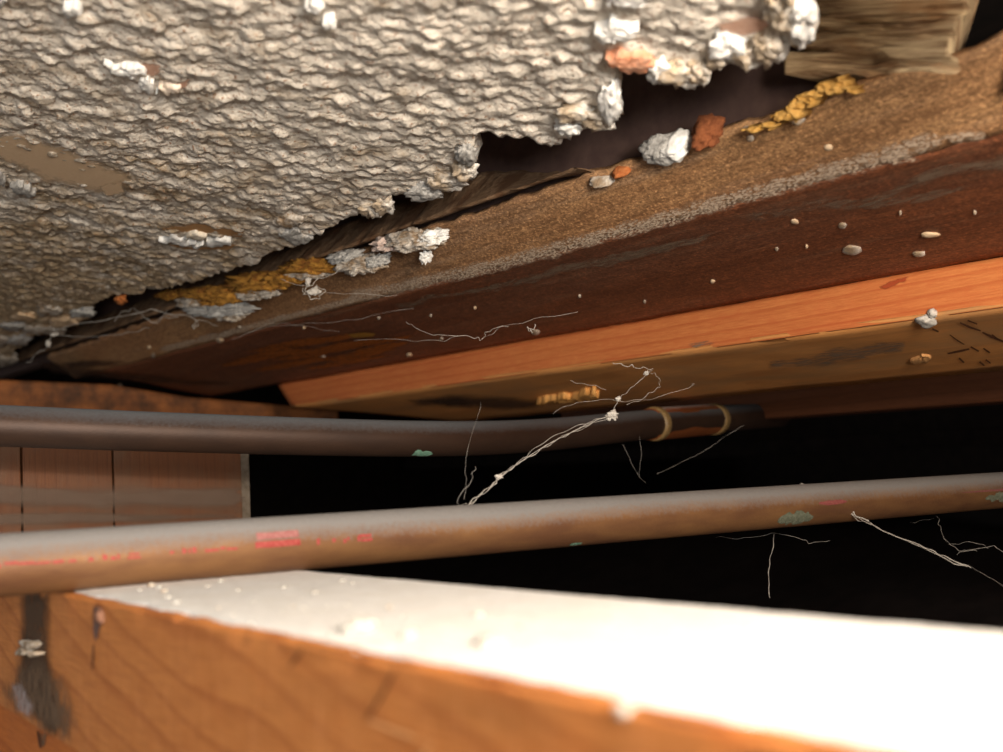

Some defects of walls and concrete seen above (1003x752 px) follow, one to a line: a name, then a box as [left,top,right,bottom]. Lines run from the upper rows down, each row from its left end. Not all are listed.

peeling [103,58,188,96]
peeling [0,170,37,198]
spalling [356,143,480,219]
peeling [158,230,232,250]
peeling [273,214,314,246]
spalling [114,294,127,306]
spalling [0,304,97,367]
water stain [8,594,71,736]